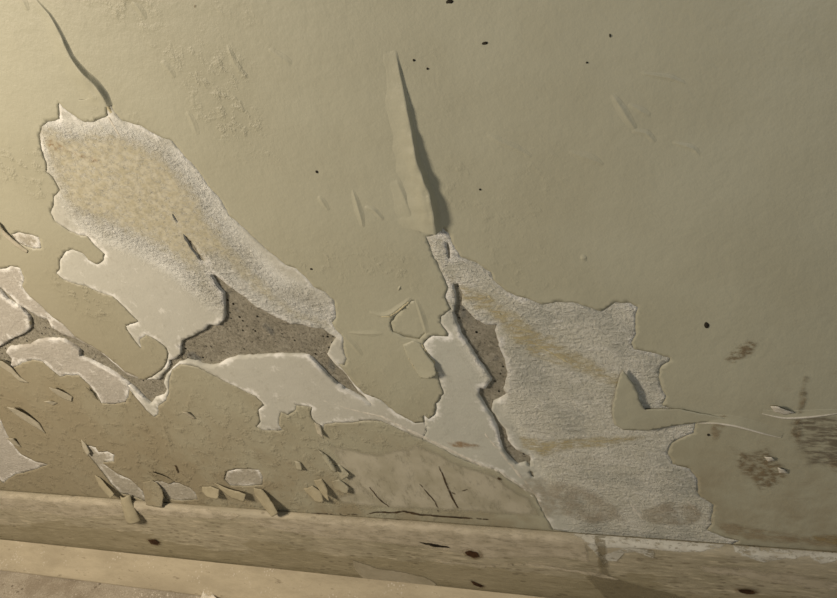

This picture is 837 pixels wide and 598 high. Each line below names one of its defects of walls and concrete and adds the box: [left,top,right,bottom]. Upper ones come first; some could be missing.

peeling [353,561,436,586]
peeling [0,103,837,580]